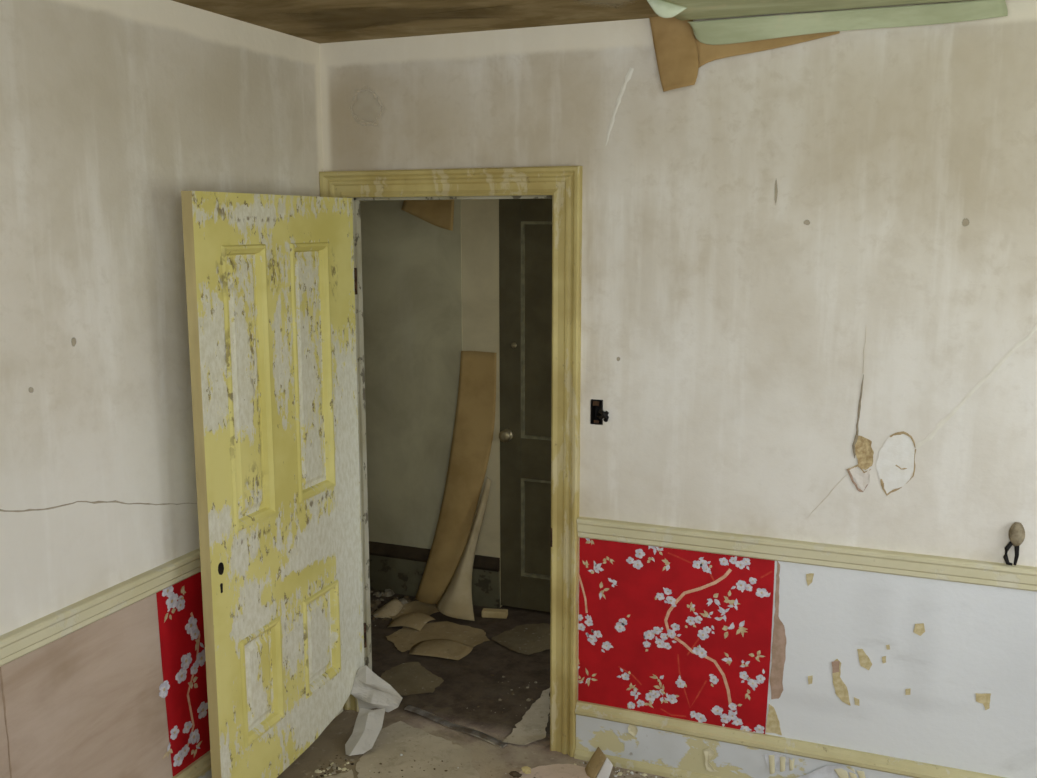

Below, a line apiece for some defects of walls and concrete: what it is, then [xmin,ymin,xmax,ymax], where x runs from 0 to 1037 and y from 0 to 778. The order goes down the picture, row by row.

flaking render [808,334,916,517]
crack [0,500,197,512]
peeling [913,623,925,636]
flaking render [766,561,786,735]
peeling [857,645,890,670]
peeling [832,659,860,706]
peeling [976,693,991,710]
peeling [765,752,866,778]